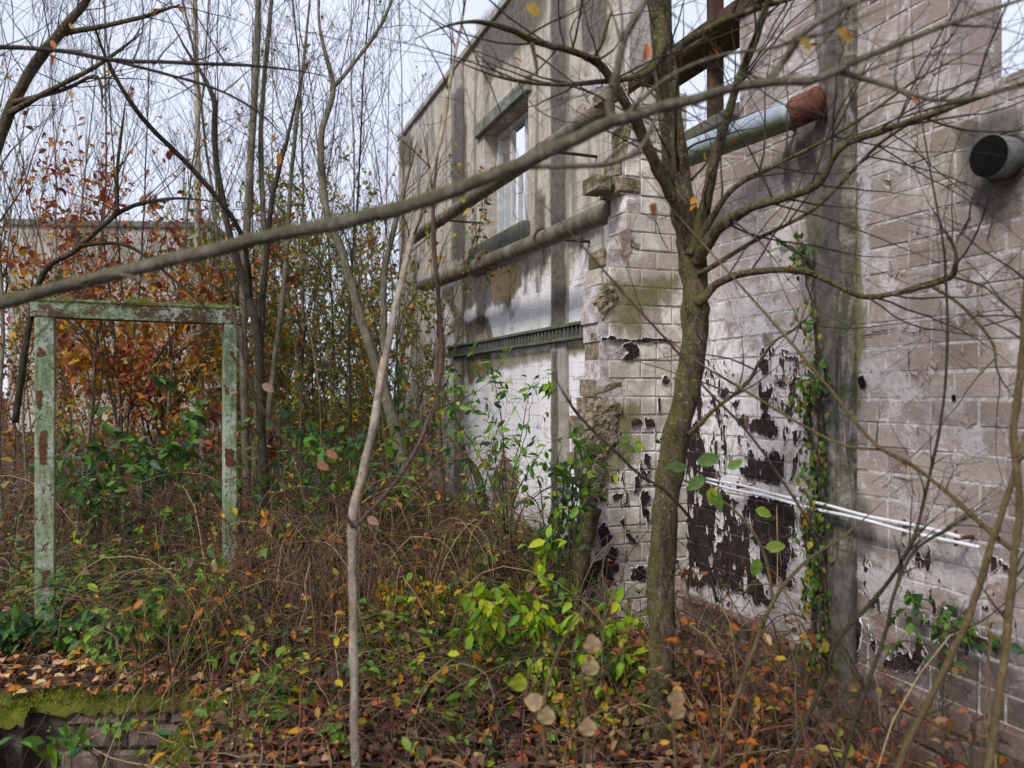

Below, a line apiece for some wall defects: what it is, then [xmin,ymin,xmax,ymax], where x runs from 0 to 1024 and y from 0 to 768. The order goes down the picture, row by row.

water stain [535,154,565,230]
water stain [783,121,819,266]
water stain [442,228,599,342]
peeling [601,335,674,362]
peeling [584,453,659,592]
peeling [629,397,661,441]
peeling [676,332,815,608]
peeling [856,555,928,674]
peeling [898,533,988,656]
spalling [982,555,1009,615]